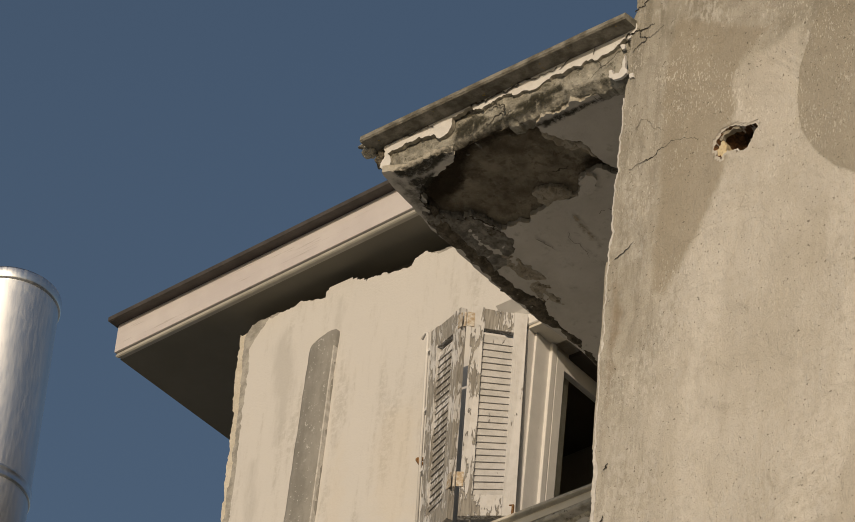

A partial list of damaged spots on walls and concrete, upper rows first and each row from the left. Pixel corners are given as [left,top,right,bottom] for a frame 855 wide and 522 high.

peeling [380,23,637,169]
spalling [422,127,598,305]
peeling [587,98,625,522]
crack [612,119,698,172]
damp [592,0,855,452]